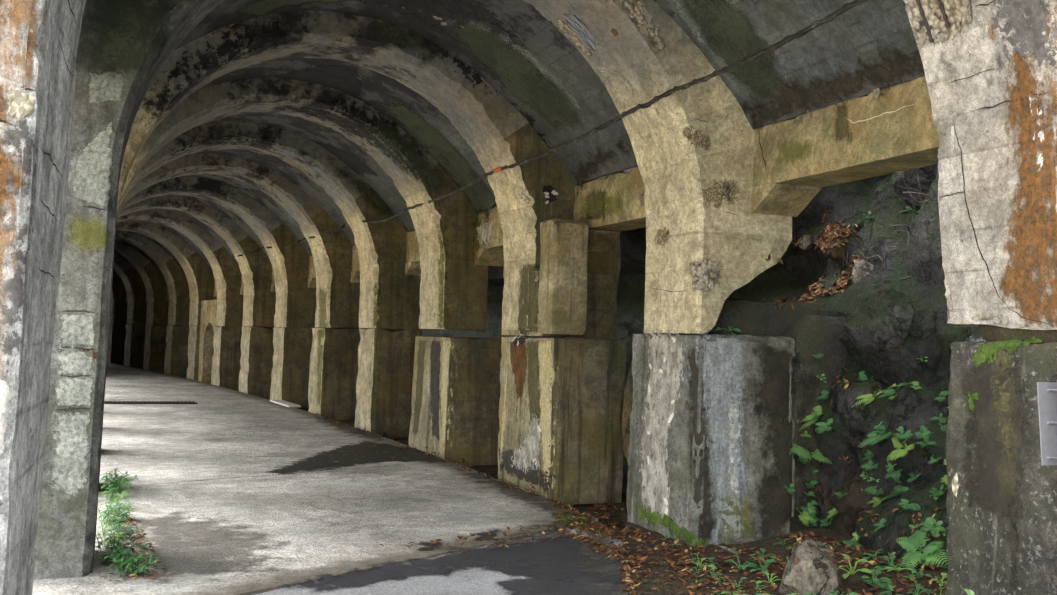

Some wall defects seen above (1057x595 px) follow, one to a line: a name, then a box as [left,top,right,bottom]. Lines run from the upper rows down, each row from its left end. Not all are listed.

water stain [133,0,345,124]
spalling [557,14,595,56]
spalling [618,0,665,50]
spalling [906,0,973,46]
crack [921,91,1050,324]
rust [510,341,527,420]
peeling [511,414,542,474]
water stain [687,333,819,554]